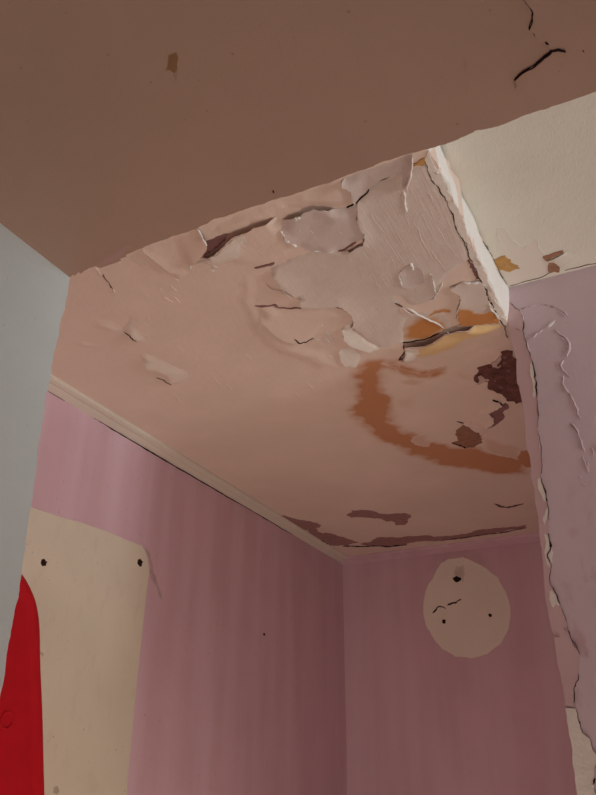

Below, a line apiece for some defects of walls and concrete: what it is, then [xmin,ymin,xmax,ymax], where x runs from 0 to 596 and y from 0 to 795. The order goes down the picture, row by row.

crack [512,49,566,99]
peeling [131,152,507,368]
peeling [494,227,581,286]
leakage [336,324,531,478]
spalling [452,350,522,449]
crack [425,164,596,706]
peeling [347,510,411,525]
peeling [281,515,526,547]
spalling [565,707,596,795]